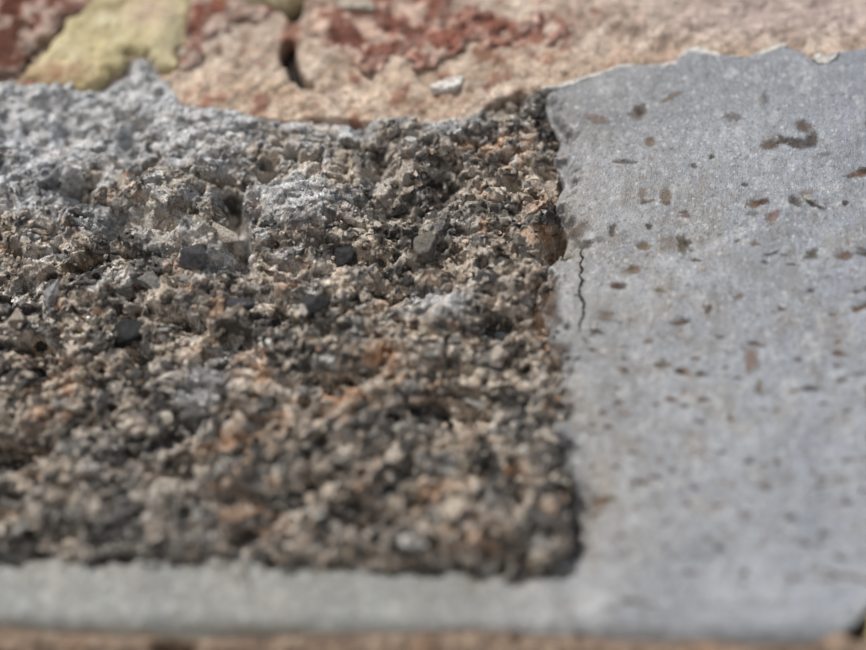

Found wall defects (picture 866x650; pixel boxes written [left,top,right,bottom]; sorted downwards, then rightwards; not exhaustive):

peeling [659,43,788,65]
spalling [0,58,636,587]
crack [574,248,588,343]